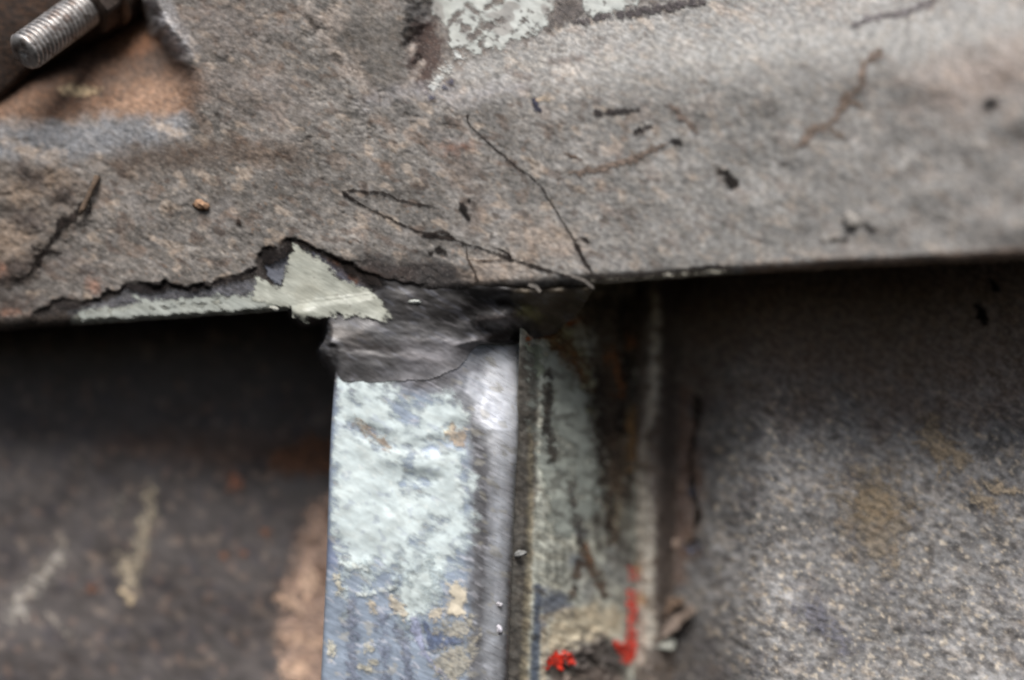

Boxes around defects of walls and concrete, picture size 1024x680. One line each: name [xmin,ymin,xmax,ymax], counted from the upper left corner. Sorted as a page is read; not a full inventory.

peeling [428,0,706,99]
crack [27,175,101,277]
crack [342,114,593,282]
peeling [56,238,392,323]
peeling [330,379,479,680]